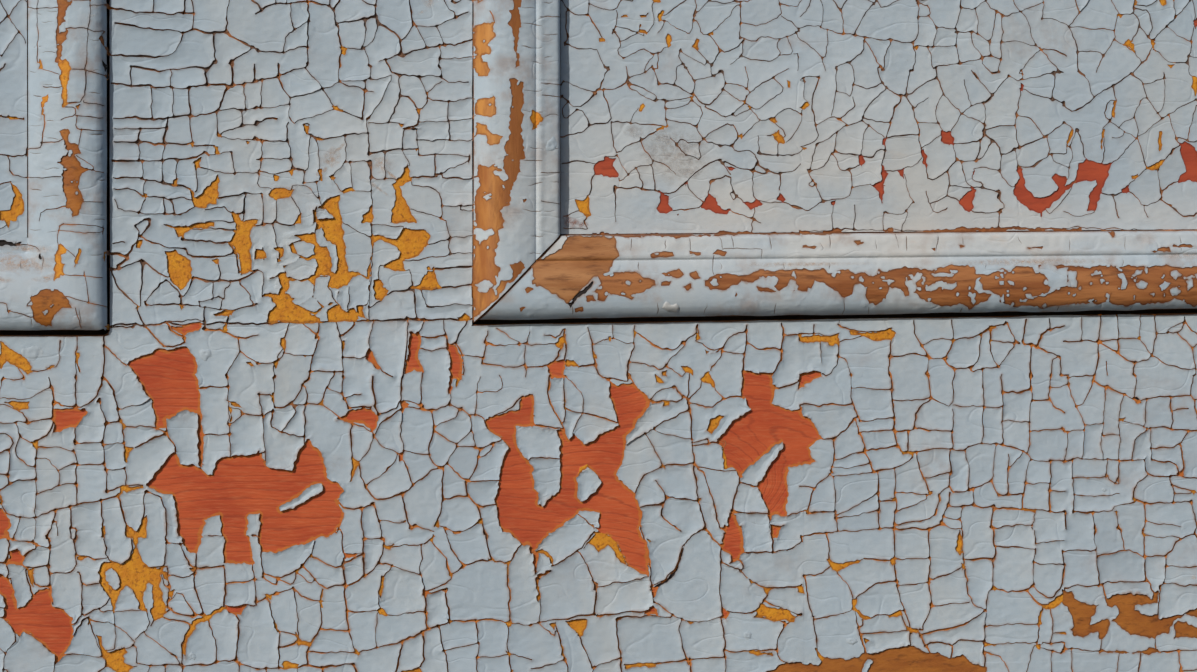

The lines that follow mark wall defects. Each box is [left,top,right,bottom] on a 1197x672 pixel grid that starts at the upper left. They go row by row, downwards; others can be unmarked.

peeling [0,495,135,672]
peeling [57,129,94,217]
peeling [75,515,175,622]
peeling [117,174,360,573]
peeling [228,164,442,375]
crack [0,0,823,672]
peeling [475,379,670,601]
peeling [707,370,824,539]
peeling [456,0,1197,321]
peeling [742,610,987,672]
crack [744,304,1197,672]
peeling [1034,589,1197,655]